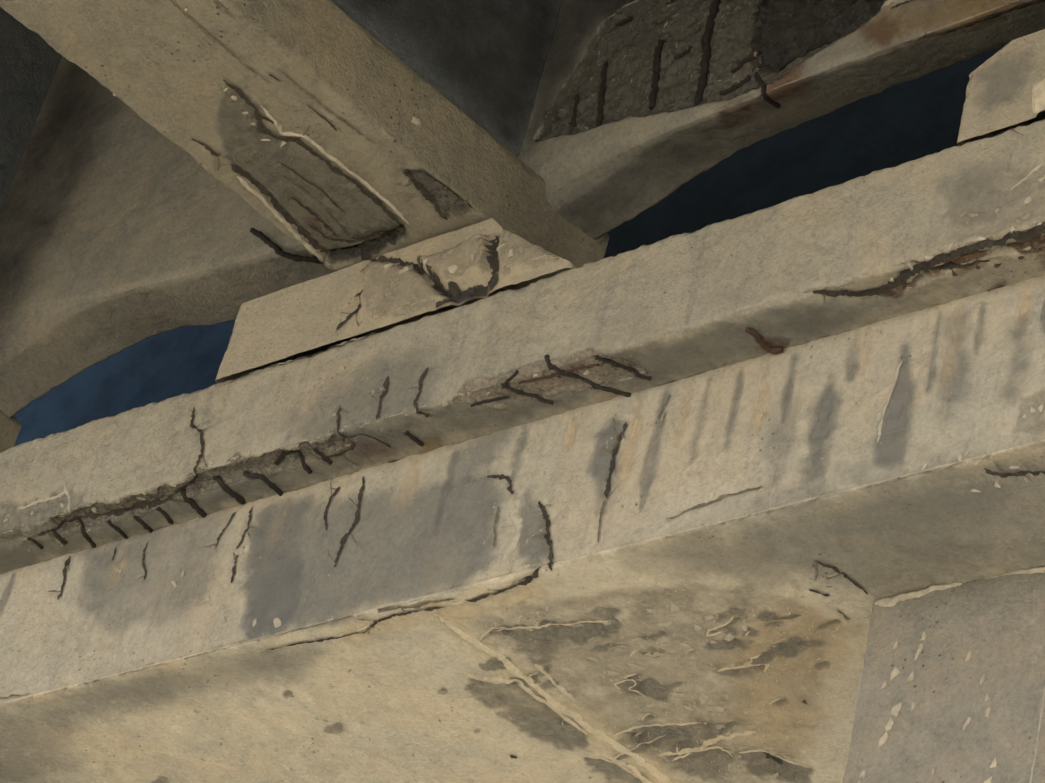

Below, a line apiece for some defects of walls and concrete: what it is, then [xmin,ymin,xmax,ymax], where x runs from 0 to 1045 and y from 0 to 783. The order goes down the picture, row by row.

spalling [534,0,887,141]
spalling [219,96,409,265]
crack [170,0,515,385]
spalling [0,431,348,549]
crack [323,405,365,567]
crack [369,367,433,420]
crack [268,474,554,650]
spalling [442,349,652,410]
damp [591,417,637,496]
damp [809,385,838,478]
damp [758,479,1008,555]
damp [876,350,912,465]